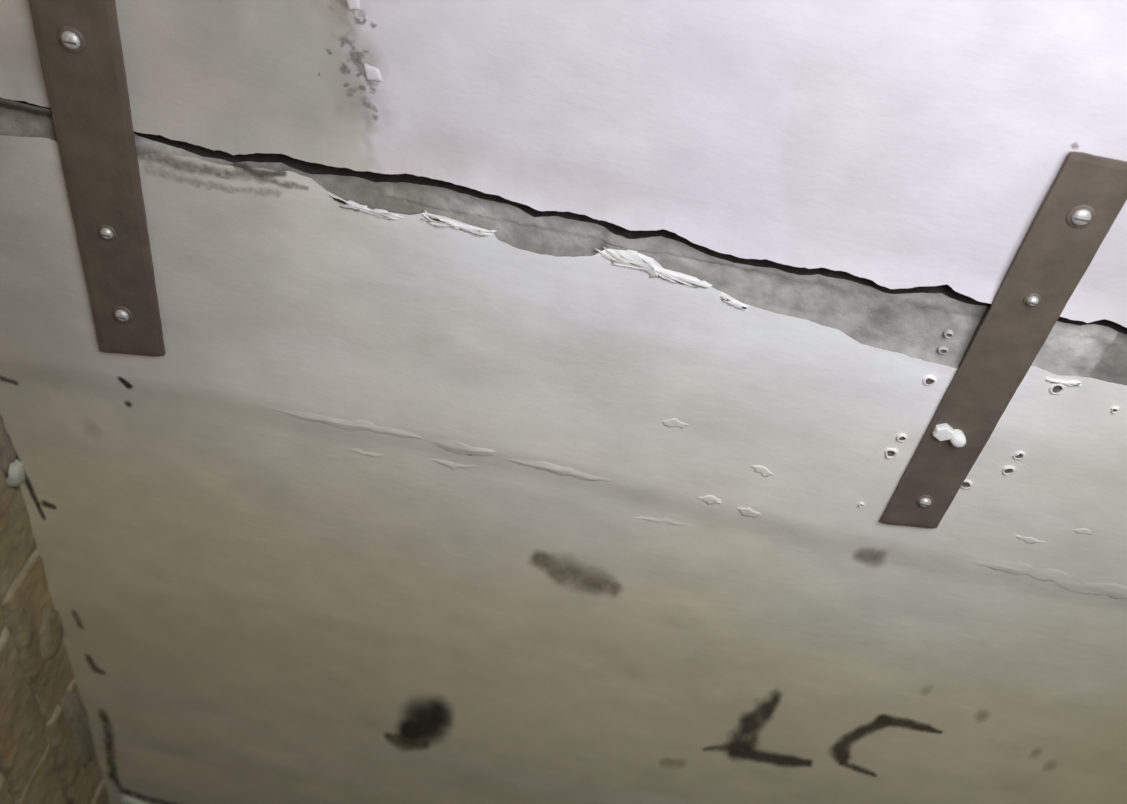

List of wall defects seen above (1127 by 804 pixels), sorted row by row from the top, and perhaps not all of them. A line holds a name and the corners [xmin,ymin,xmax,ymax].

crack [0,100,53,119]
spalling [0,97,57,141]
crack [134,131,991,307]
spalling [134,133,989,369]
crack [1057,317,1127,335]
spalling [1031,321,1127,386]
leakage [533,554,618,592]
leakage [385,702,449,749]